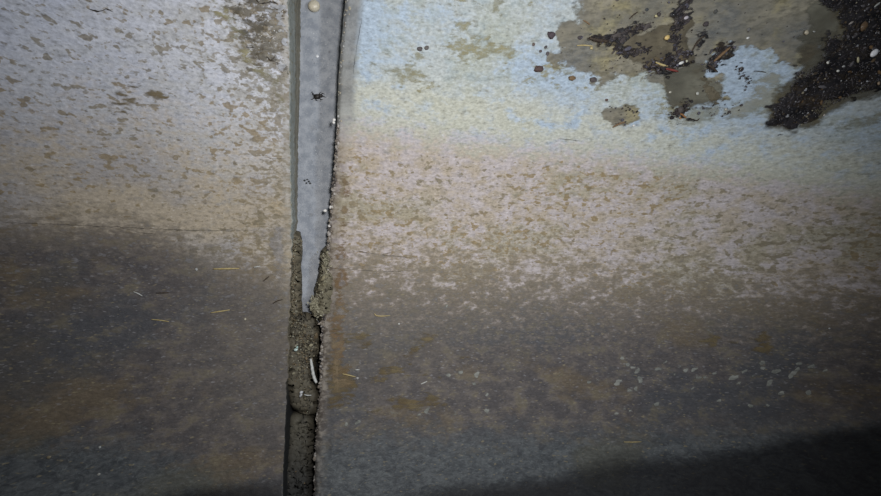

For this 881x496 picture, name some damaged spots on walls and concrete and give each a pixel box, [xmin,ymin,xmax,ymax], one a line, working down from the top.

spalling [211,0,289,81]
leakage [526,0,881,133]